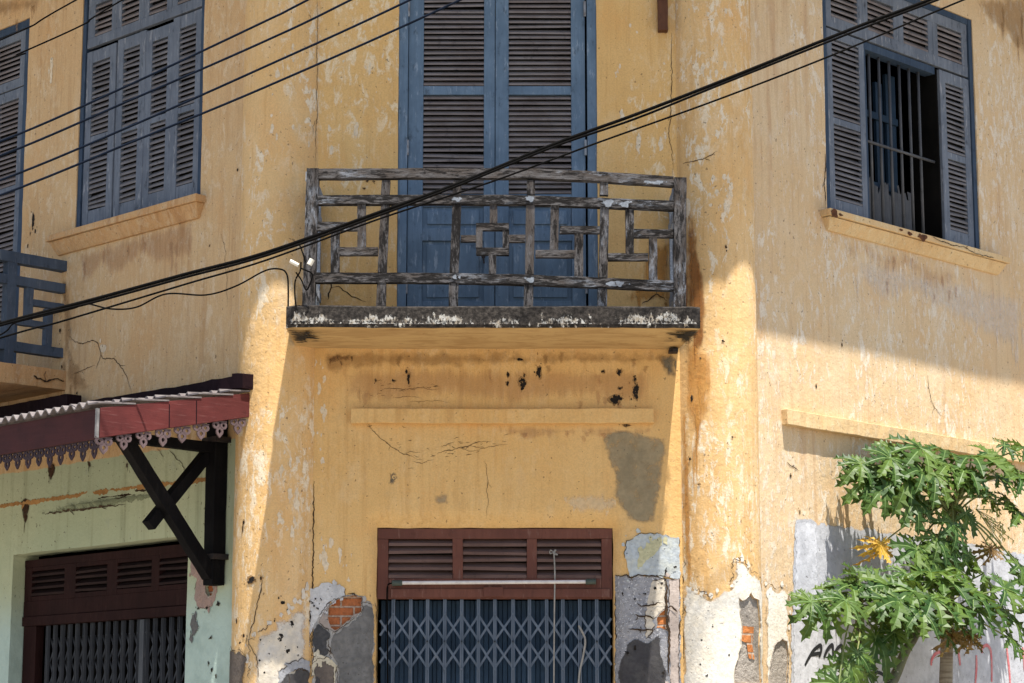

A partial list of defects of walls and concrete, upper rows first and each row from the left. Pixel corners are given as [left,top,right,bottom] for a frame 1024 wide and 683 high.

crack [668,42,714,175]
peeling [290,311,473,325]
peeling [539,314,594,324]
peeling [619,312,697,324]
crack [34,338,131,389]
leakage [663,358,676,374]
crack [369,425,507,521]
peeling [236,536,375,683]
peeling [622,528,791,683]